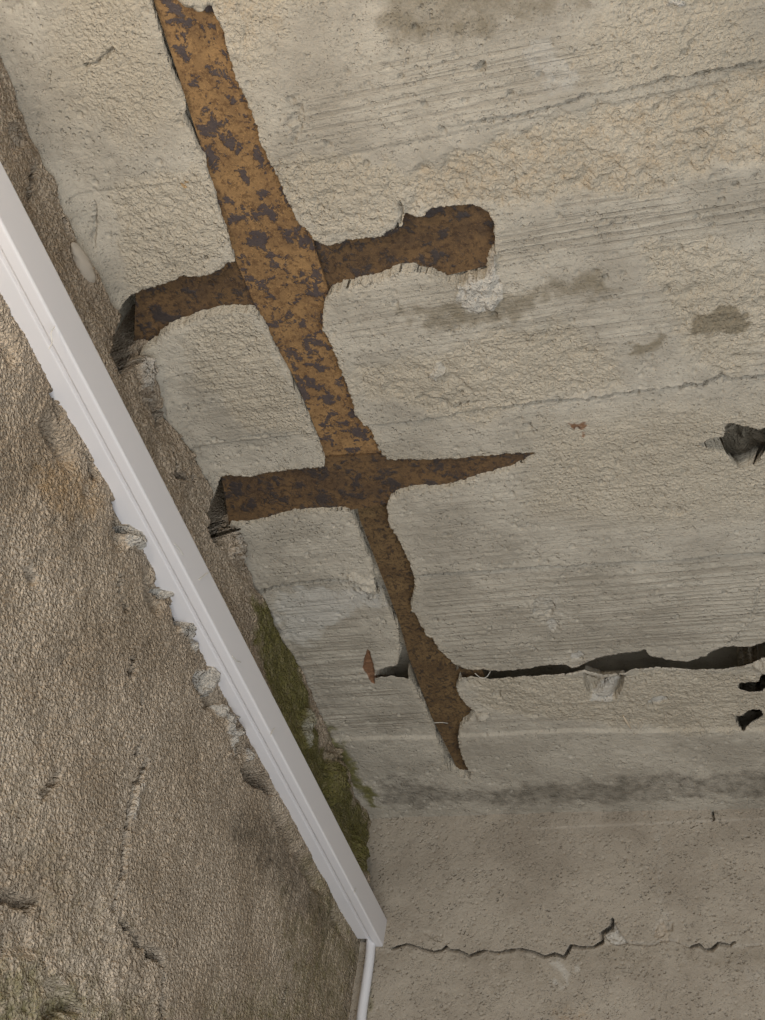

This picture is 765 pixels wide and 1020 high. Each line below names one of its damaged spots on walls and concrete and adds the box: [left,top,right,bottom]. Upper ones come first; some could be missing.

crack [464,58,765,127]
spalling [109,0,406,663]
spalling [49,388,66,420]
crack [365,371,765,427]
spalling [322,201,539,779]
crack [414,551,765,577]
leakage [262,581,389,660]
rust [361,648,397,685]
crack [454,580,765,712]
crack [390,917,765,960]